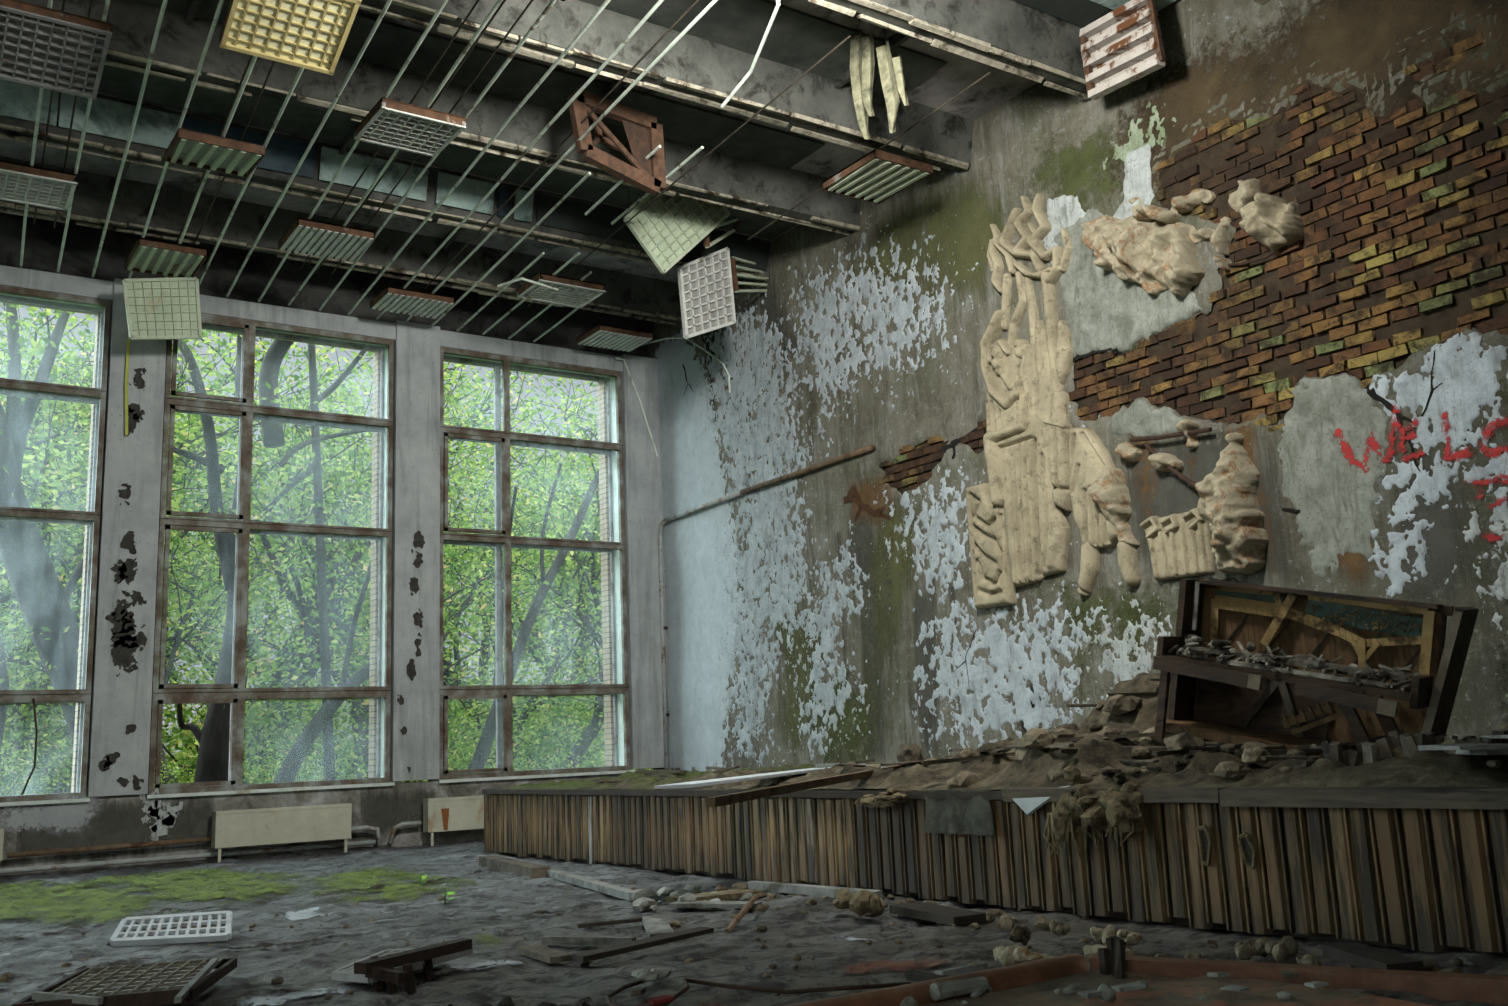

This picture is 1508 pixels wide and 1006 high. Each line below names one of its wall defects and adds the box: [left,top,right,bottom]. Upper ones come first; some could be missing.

peeling [120,368,146,436]
flaking render [1043,33,1508,634]
peeling [118,483,132,506]
peeling [654,208,1172,772]
peeling [105,531,147,677]
peeling [397,531,425,705]
water stain [837,519,909,755]
water stain [914,581,956,750]
peeling [98,752,183,841]